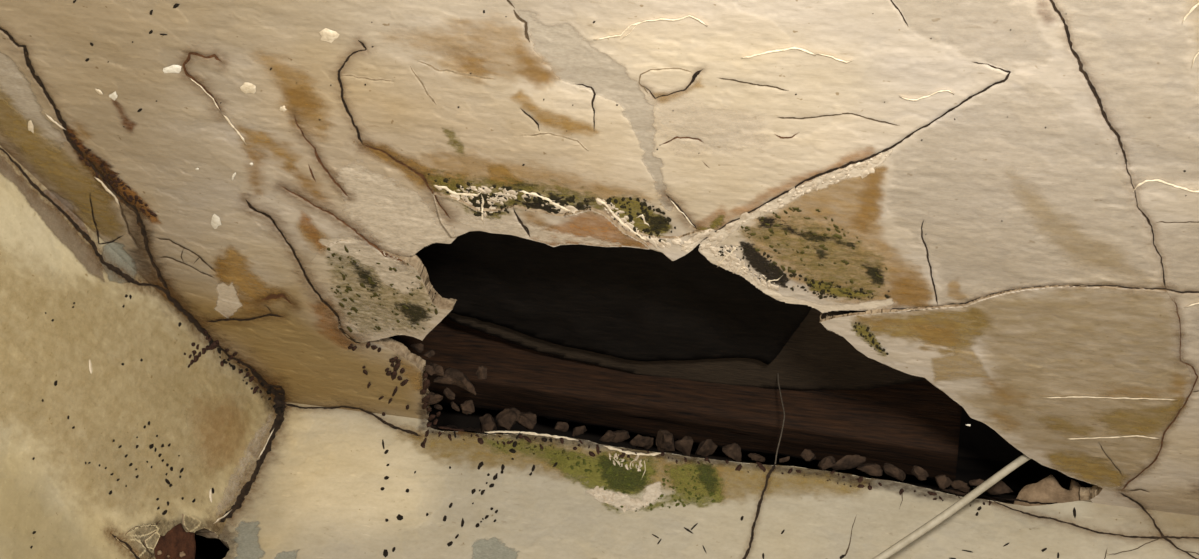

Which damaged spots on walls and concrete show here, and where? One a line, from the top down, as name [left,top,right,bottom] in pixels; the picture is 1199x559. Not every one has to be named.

rust [67,127,157,218]
leakage [515,93,596,132]
leakage [469,164,642,247]
crack [639,61,1011,240]
crack [0,27,420,526]
crack [891,0,1199,559]
flaking render [115,429,299,559]
leakage [426,503,498,547]
peeling [486,431,579,441]
peeling [586,446,662,513]
leakage [410,430,868,504]
crack [742,463,775,559]